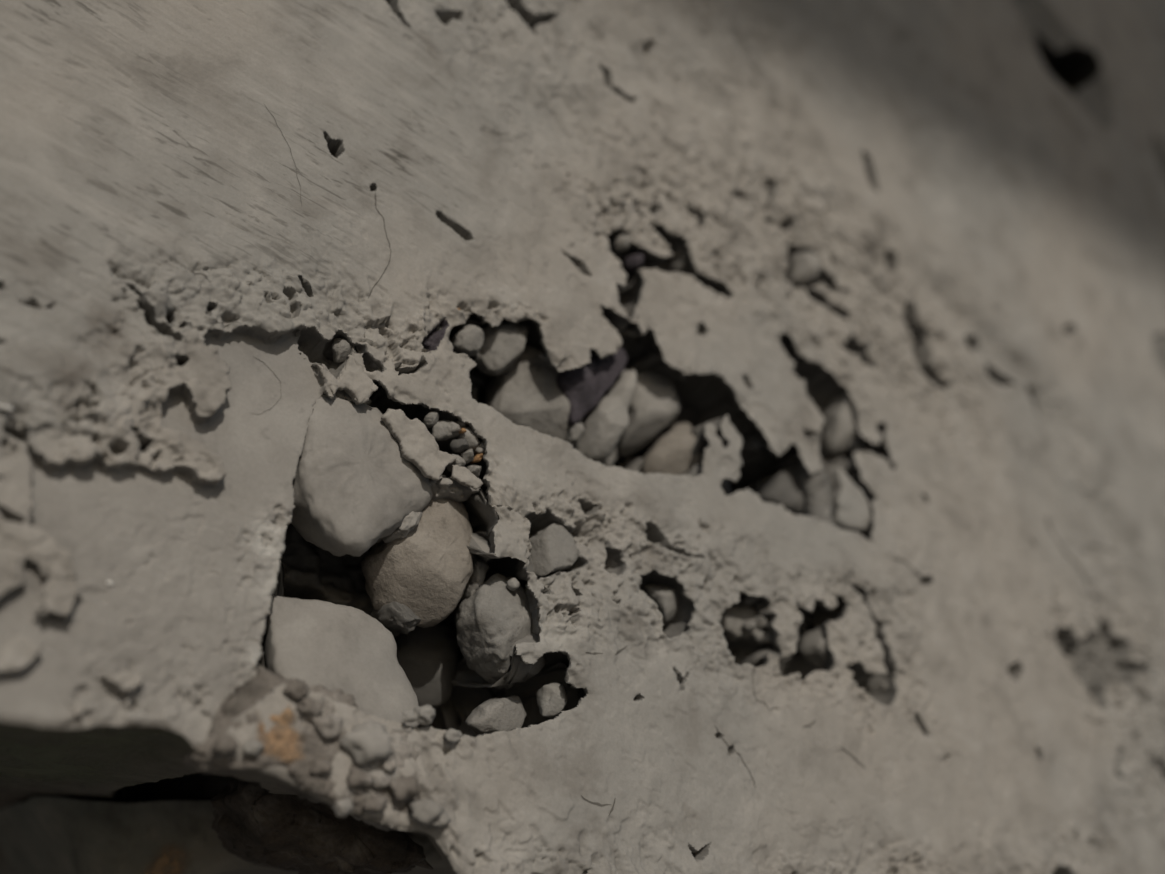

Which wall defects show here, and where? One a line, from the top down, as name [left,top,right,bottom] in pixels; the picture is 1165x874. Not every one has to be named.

hole [435,210,475,240]
spalling [560,248,593,277]
hole [884,249,899,272]
spalling [697,322,710,336]
peeling [381,409,483,490]
spalling [578,498,602,515]
peeling [471,504,532,569]
spalling [645,521,707,559]
spalling [0,274,451,874]
spalling [673,666,692,691]
spalling [443,728,462,743]